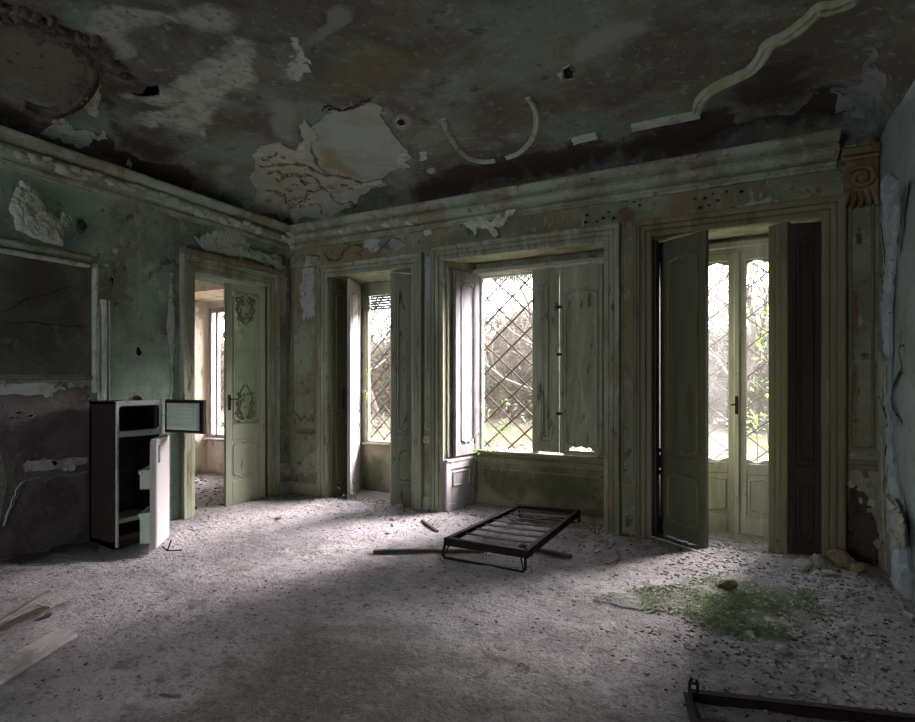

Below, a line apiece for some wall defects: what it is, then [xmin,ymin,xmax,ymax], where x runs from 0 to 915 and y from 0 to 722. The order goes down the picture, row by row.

flaking render [284,37,312,81]
flaking render [834,41,888,120]
flaking render [40,118,107,149]
flaking render [311,102,437,182]
damp [408,51,860,203]
peeling [297,256,316,322]
crack [3,471,87,526]
flaking render [0,380,91,559]
flaking render [846,480,906,565]
crack [881,332,906,533]